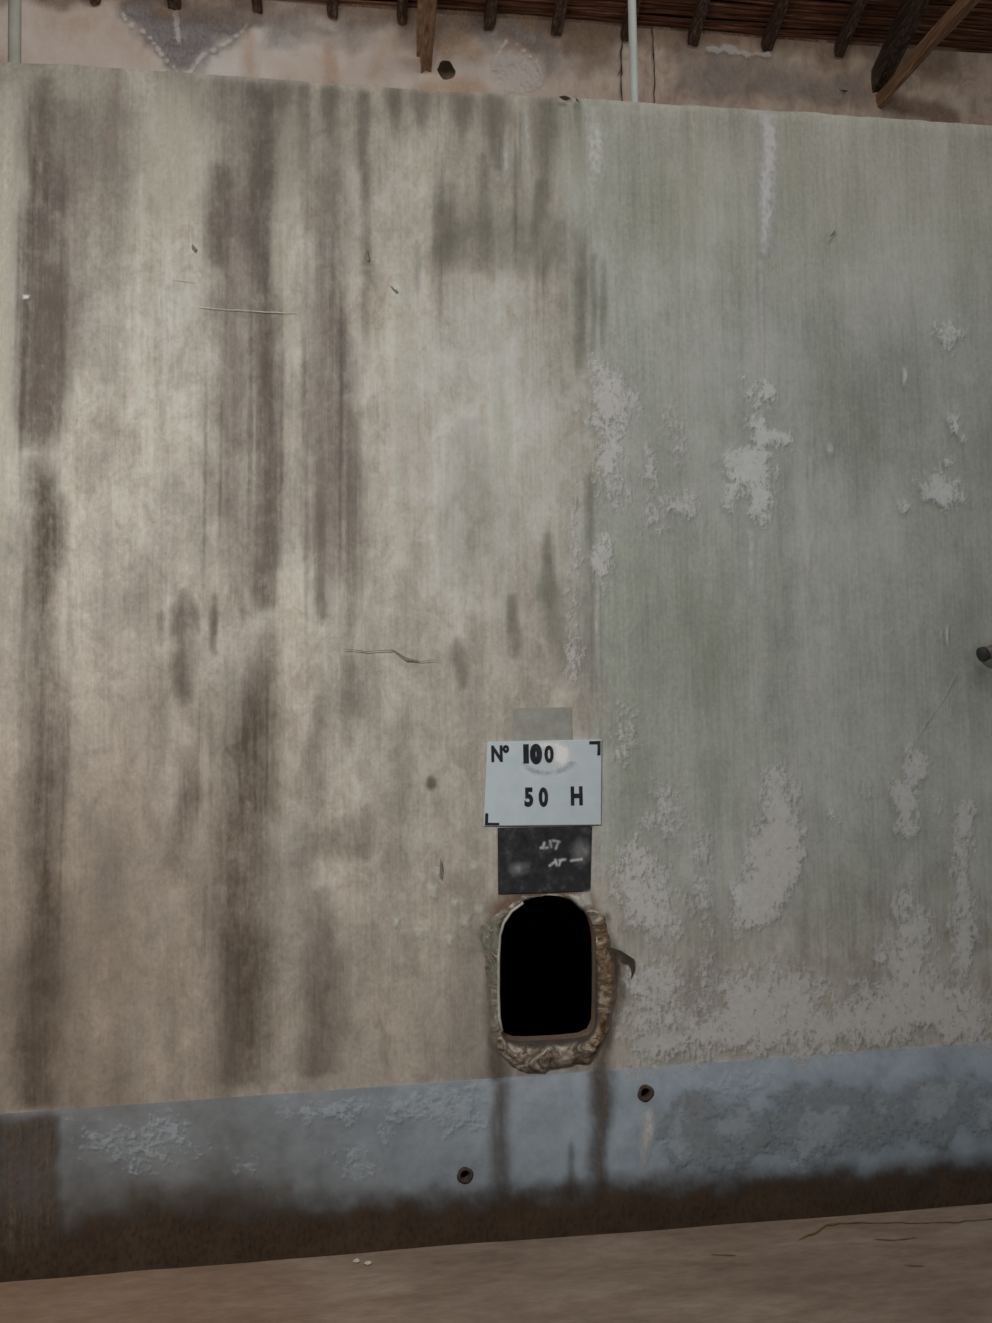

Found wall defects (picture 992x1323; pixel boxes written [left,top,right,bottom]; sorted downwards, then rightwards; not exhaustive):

damp [0,111,63,441]
damp [242,140,274,452]
damp [576,102,606,217]
damp [758,113,780,381]
damp [35,478,57,606]
peeling [563,353,700,684]
peeling [722,375,793,528]
peeling [898,459,966,513]
peeling [888,743,930,839]
peeling [452,762,992,1091]
damp [0,850,992,1283]
peeling [790,1105,849,1174]